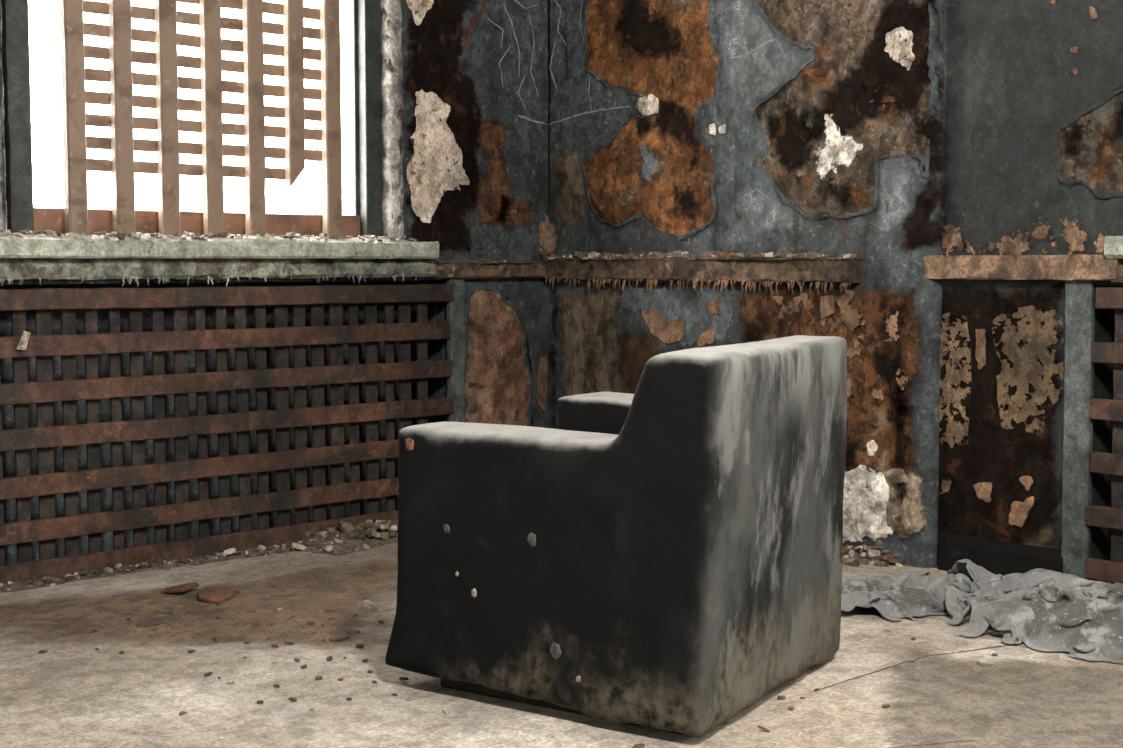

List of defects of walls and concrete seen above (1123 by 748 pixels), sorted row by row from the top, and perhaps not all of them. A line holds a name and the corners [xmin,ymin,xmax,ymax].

spalling [406,0,434,26]
spalling [406,89,470,223]
crack [488,0,630,216]
spalling [580,0,721,240]
spalling [752,0,943,220]
spalling [1056,85,1123,200]
peeling [772,290,866,361]
peeling [885,311,900,342]
peeling [896,367,909,390]
peeling [939,305,1064,448]
peeling [973,482,992,503]
peeling [1009,476,1035,528]